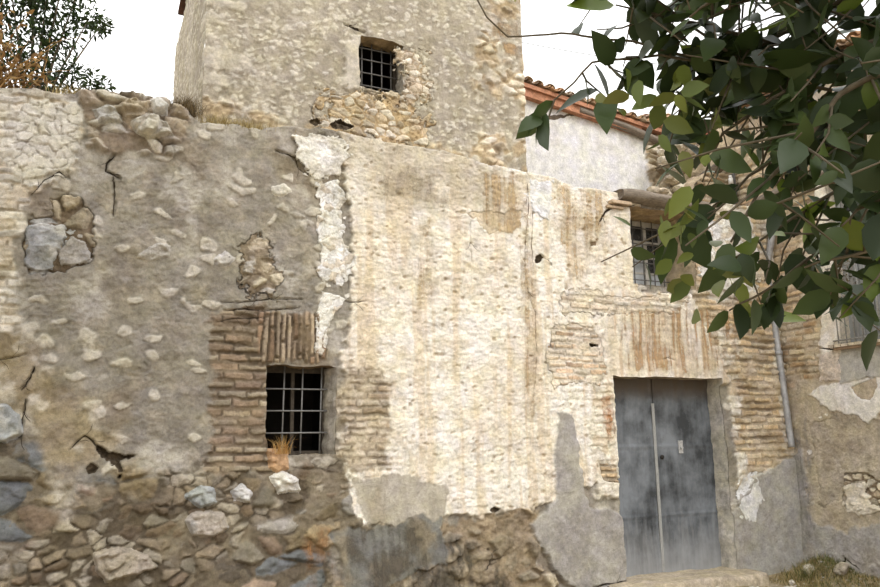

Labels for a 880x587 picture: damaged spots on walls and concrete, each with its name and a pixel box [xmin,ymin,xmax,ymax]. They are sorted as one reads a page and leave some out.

crack [98,157,119,217]
spalling [290,42,436,356]
spalling [22,192,96,275]
peeling [697,216,756,277]
peeling [723,248,761,302]
crack [72,424,103,448]
peeling [807,411,880,516]